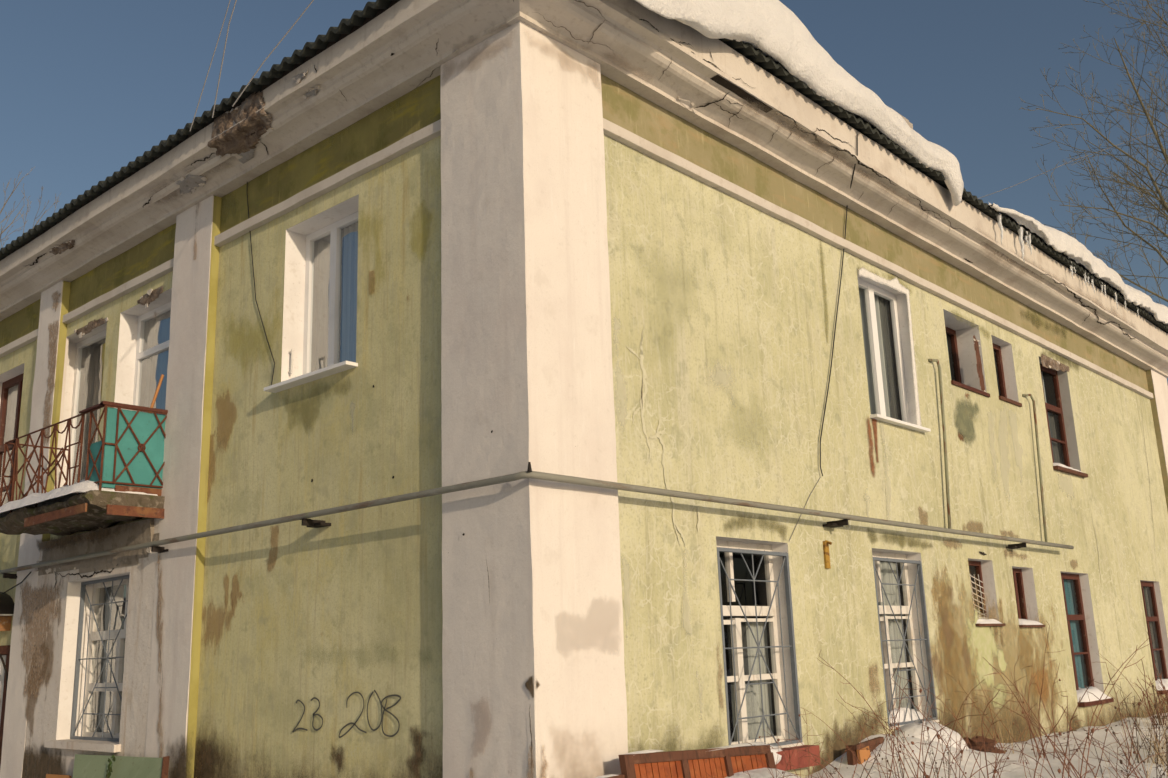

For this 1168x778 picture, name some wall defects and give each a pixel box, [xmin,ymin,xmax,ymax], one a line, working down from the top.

spalling [206,91,273,164]
crack [513,0,973,263]
spalling [49,240,75,256]
crack [1041,274,1135,339]
water stain [955,394,978,441]
rust [868,418,879,475]
peeling [20,533,159,699]
water stain [941,615,1038,743]
water stain [1071,702,1168,731]
water stain [170,740,231,778]
water stain [331,748,343,770]
water stain [410,729,424,776]